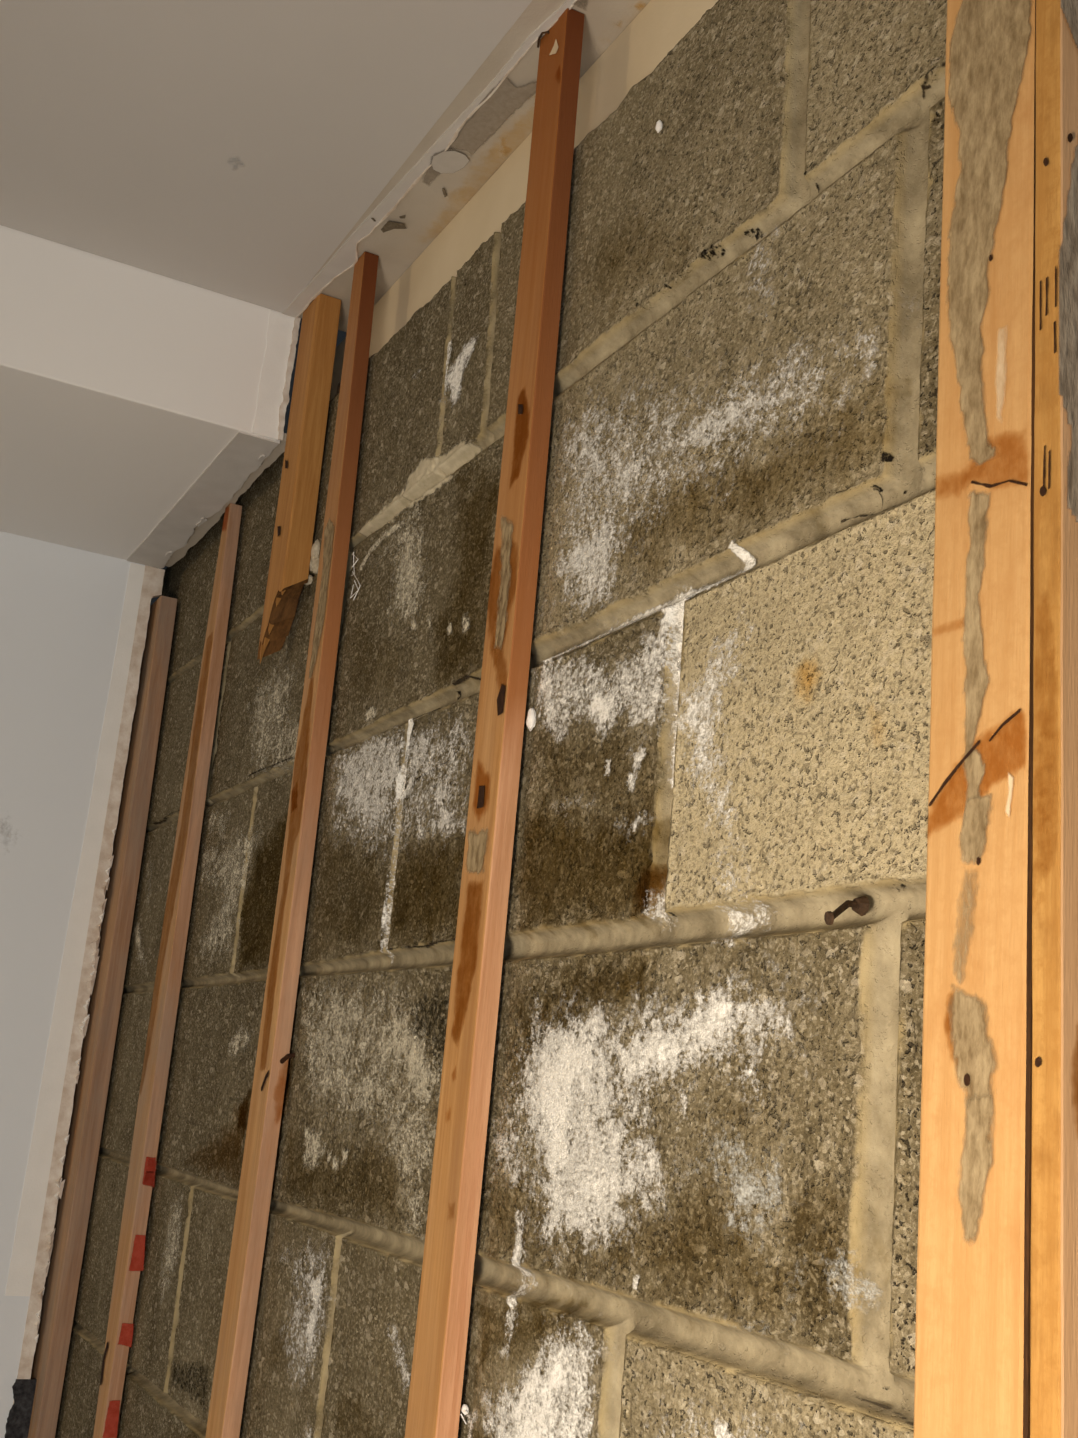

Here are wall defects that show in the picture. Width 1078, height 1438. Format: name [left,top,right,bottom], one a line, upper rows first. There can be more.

leakage [557,351,822,607]
leakage [360,505,469,634]
leakage [333,718,469,849]
crack [929,709,1021,806]
leakage [381,856,408,963]
leakage [498,971,791,1252]
leakage [501,1211,538,1354]
leakage [832,1262,874,1306]
leakage [468,1321,598,1438]